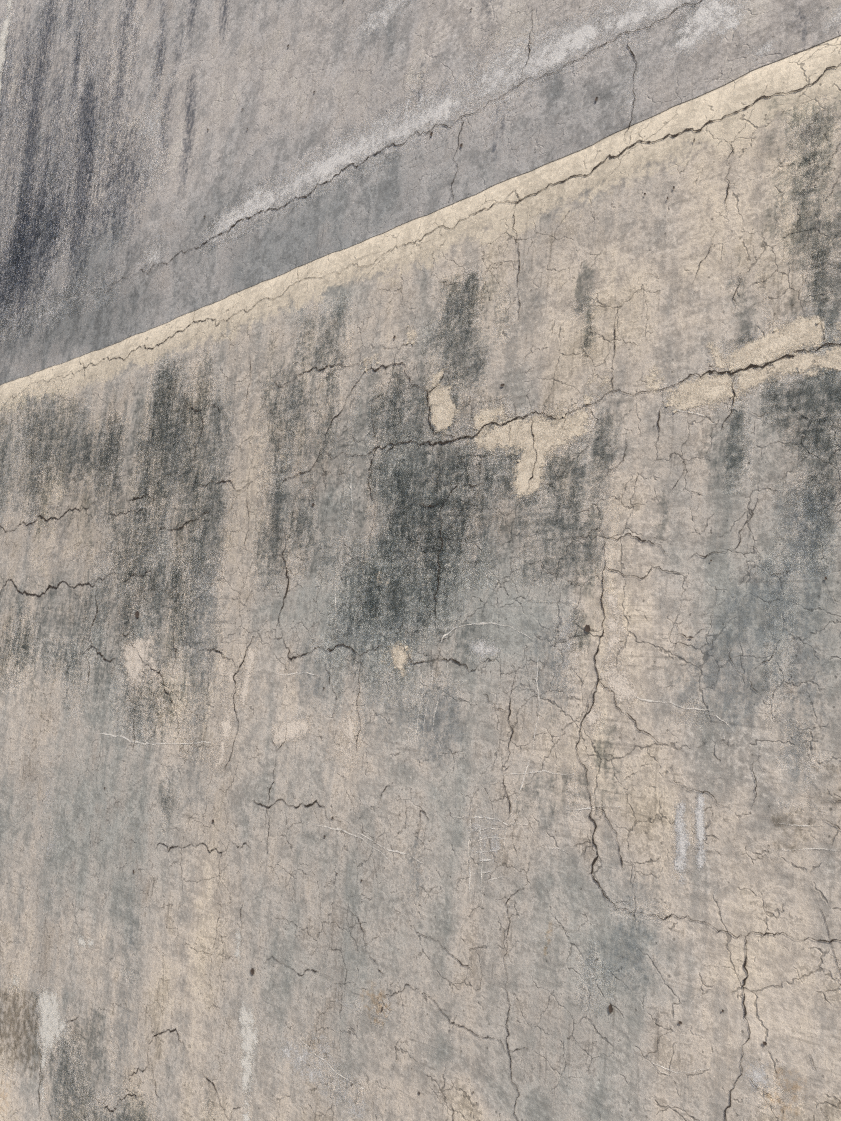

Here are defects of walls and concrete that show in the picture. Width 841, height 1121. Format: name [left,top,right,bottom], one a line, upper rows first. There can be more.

crack [3,0,841,406]
water stain [207,0,748,242]
crack [0,300,841,627]
crack [0,570,179,733]
crack [206,528,516,819]
efflorescence [470,640,499,659]
crack [156,726,328,950]
crack [561,500,841,1121]
crack [106,1025,184,1112]
crack [345,888,526,1120]